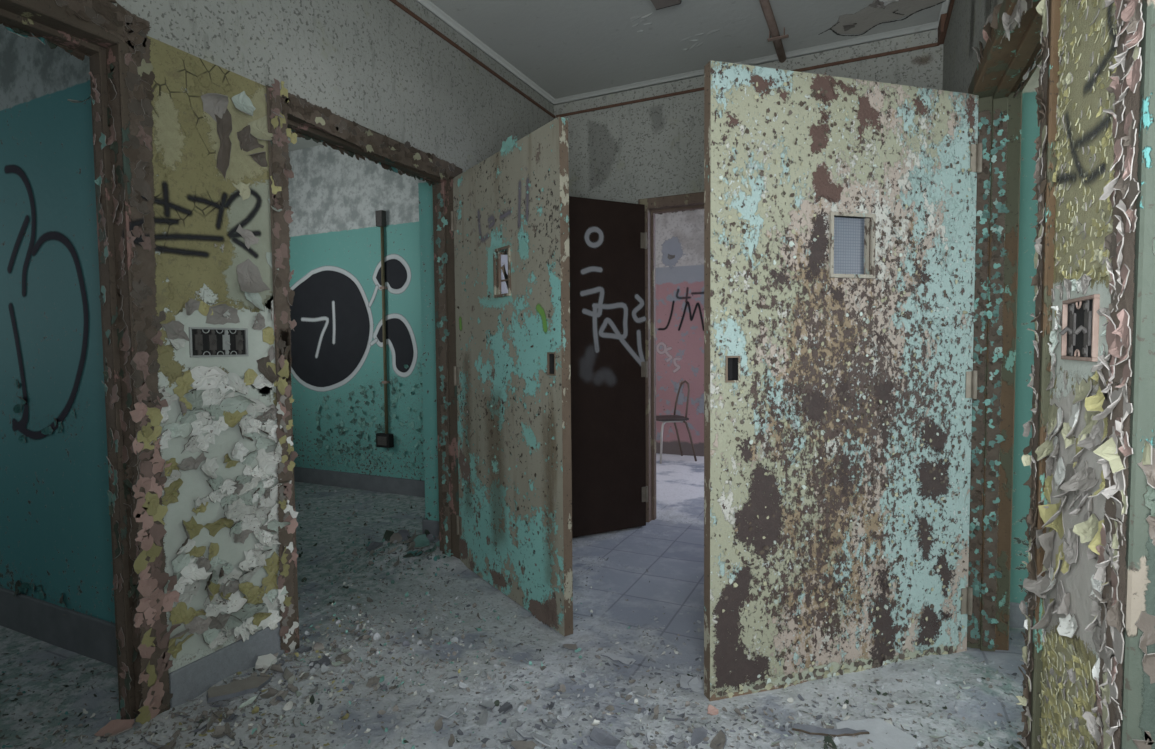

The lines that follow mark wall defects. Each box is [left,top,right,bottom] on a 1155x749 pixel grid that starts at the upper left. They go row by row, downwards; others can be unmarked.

peeling [831,0,945,35]
peeling [500,135,518,158]
peeling [661,236,685,269]
peeling [665,109,1010,749]